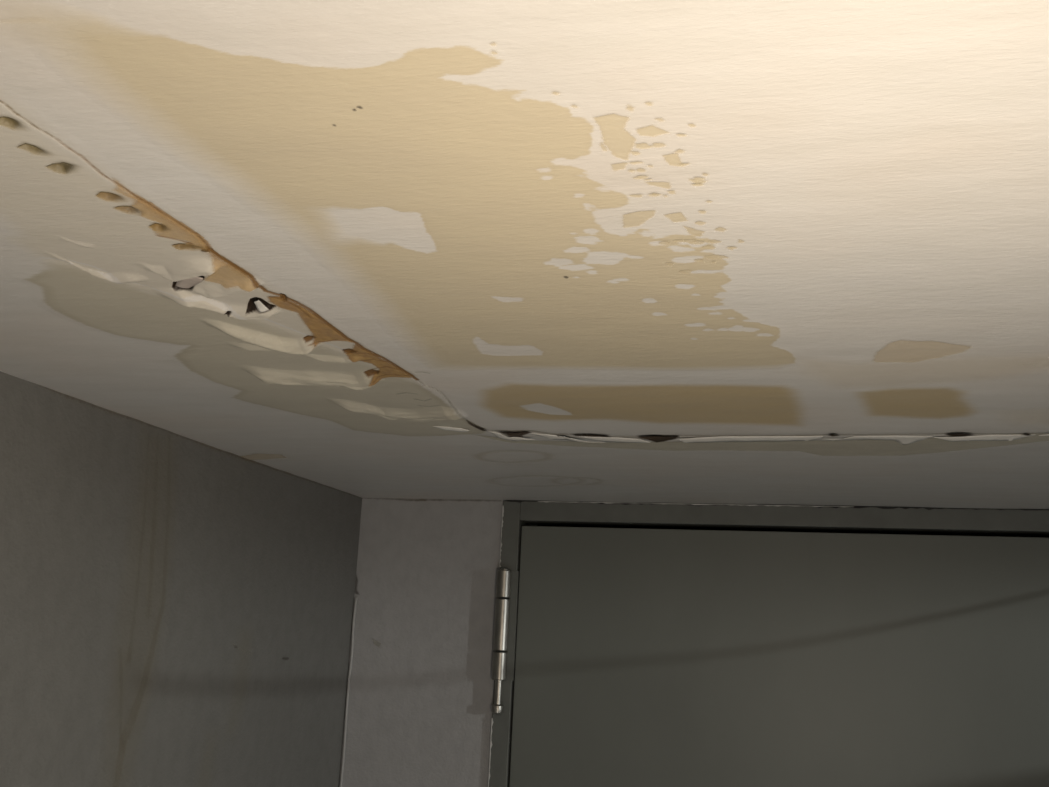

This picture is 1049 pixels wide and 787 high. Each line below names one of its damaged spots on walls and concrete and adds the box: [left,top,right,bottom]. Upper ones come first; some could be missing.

hole [96,192,138,213]
hole [149,223,167,232]
damp [0,2,1049,456]
hole [246,297,276,313]
crack [181,224,418,380]
crack [467,420,679,442]
crack [946,430,973,438]